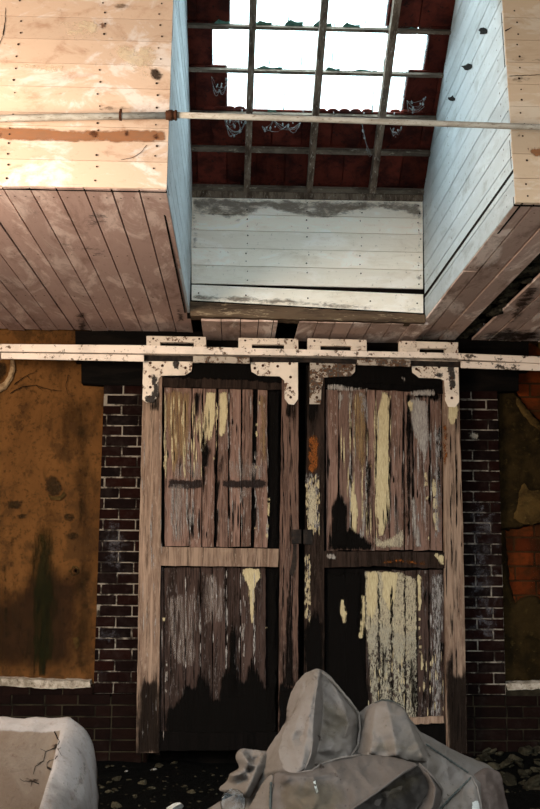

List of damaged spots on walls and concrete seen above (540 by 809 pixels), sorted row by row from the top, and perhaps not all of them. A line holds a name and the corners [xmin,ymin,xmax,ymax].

crack [10,371,69,395]
peeling [145,375,200,538]
peeling [205,392,228,441]
peeling [231,395,266,478]
leakage [0,573,80,662]
peeling [359,571,443,717]
flaking render [501,530,540,681]